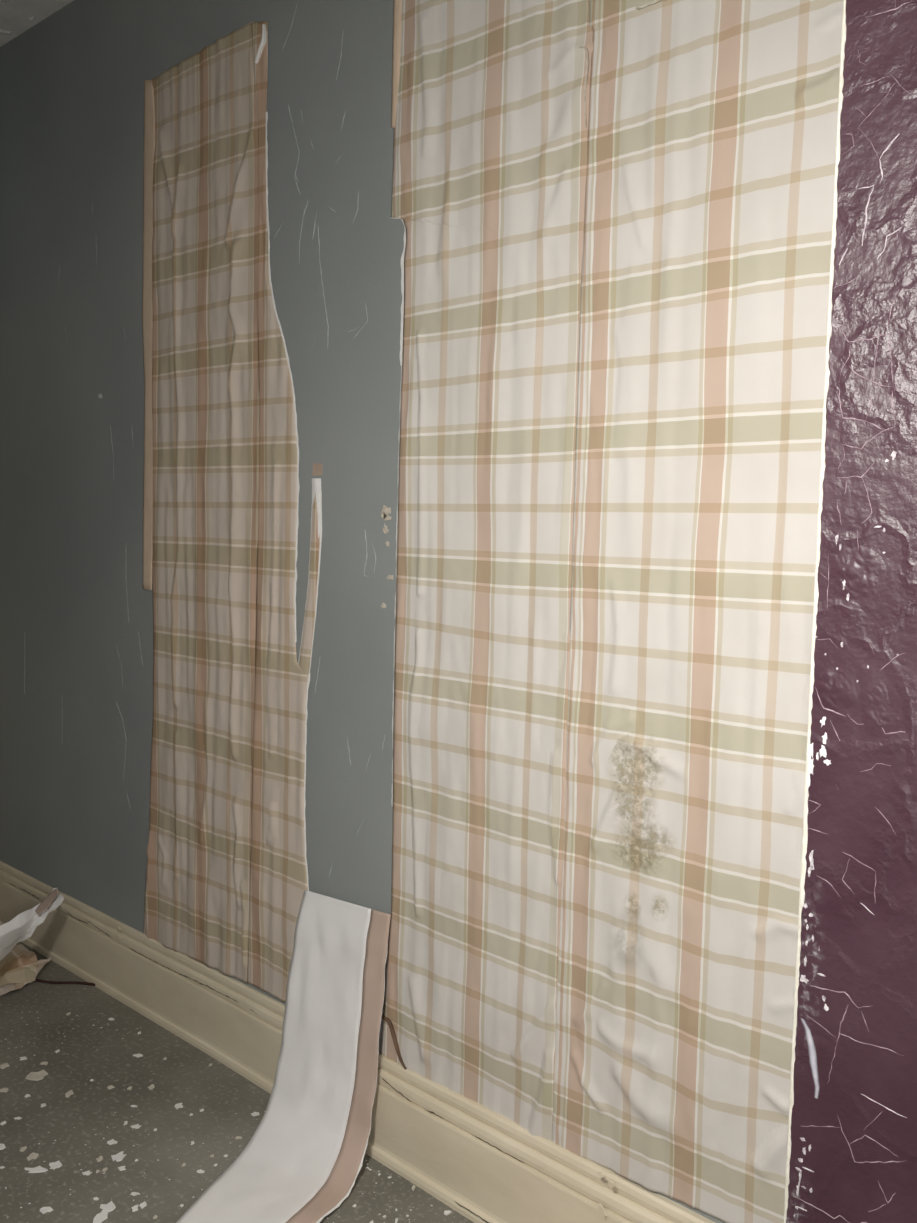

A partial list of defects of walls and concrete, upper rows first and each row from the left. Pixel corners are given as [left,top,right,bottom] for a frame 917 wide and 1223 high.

crack [868,0,911,17]
crack [833,51,910,289]
crack [837,290,899,548]
peeling [381,505,392,547]
crack [815,687,903,741]
crack [808,763,890,915]
crack [807,986,903,1084]
crack [792,1094,907,1223]